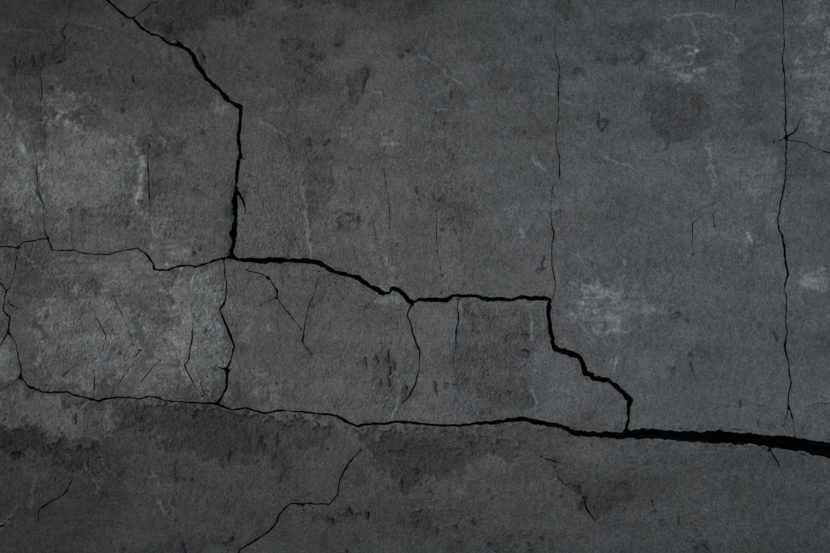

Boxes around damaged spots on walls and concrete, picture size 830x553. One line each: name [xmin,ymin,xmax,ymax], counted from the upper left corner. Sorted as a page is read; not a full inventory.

crack [0,0,246,401]
crack [0,214,830,459]
crack [551,41,560,207]
crack [774,0,830,439]
crack [238,451,360,553]